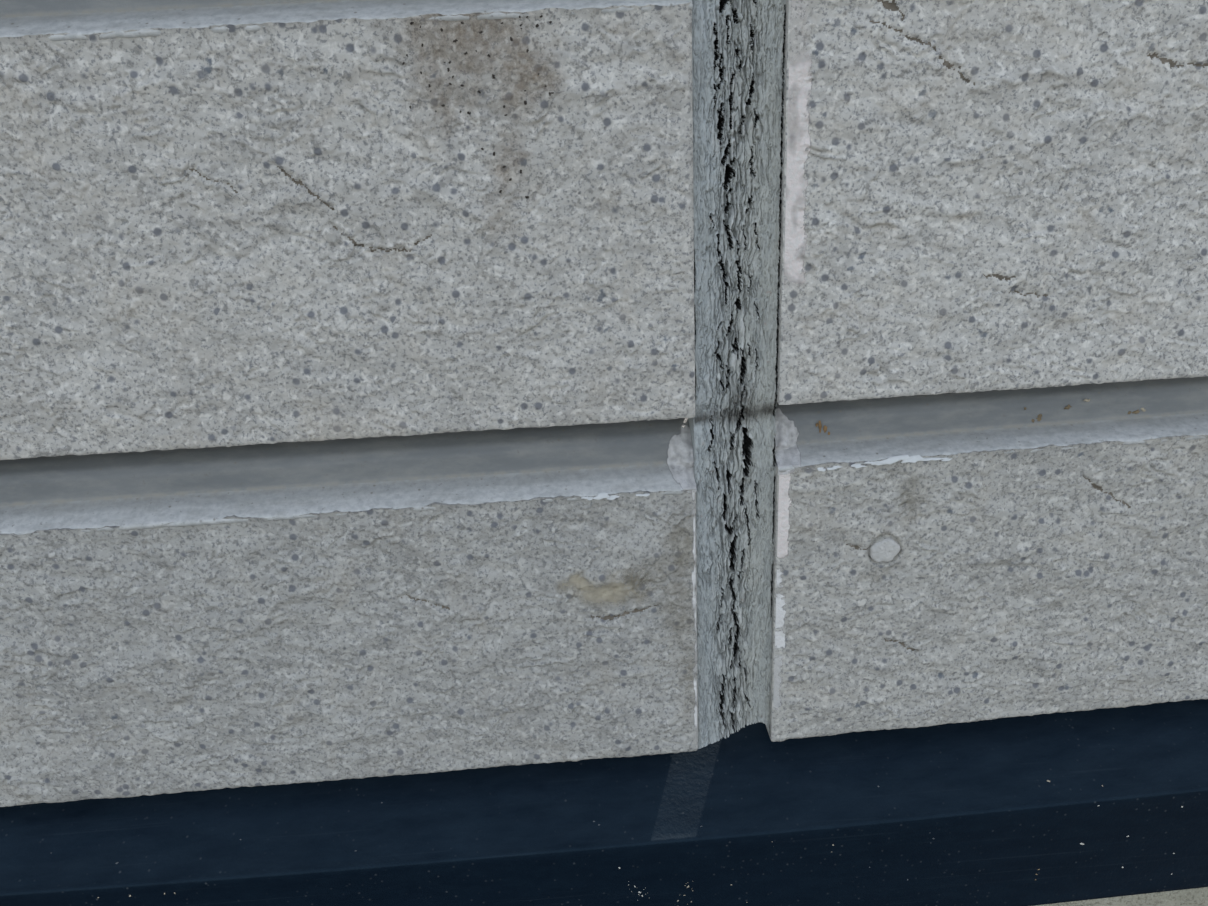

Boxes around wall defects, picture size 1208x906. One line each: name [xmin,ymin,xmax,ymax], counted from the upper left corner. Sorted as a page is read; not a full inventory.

crack [694,0,786,731]